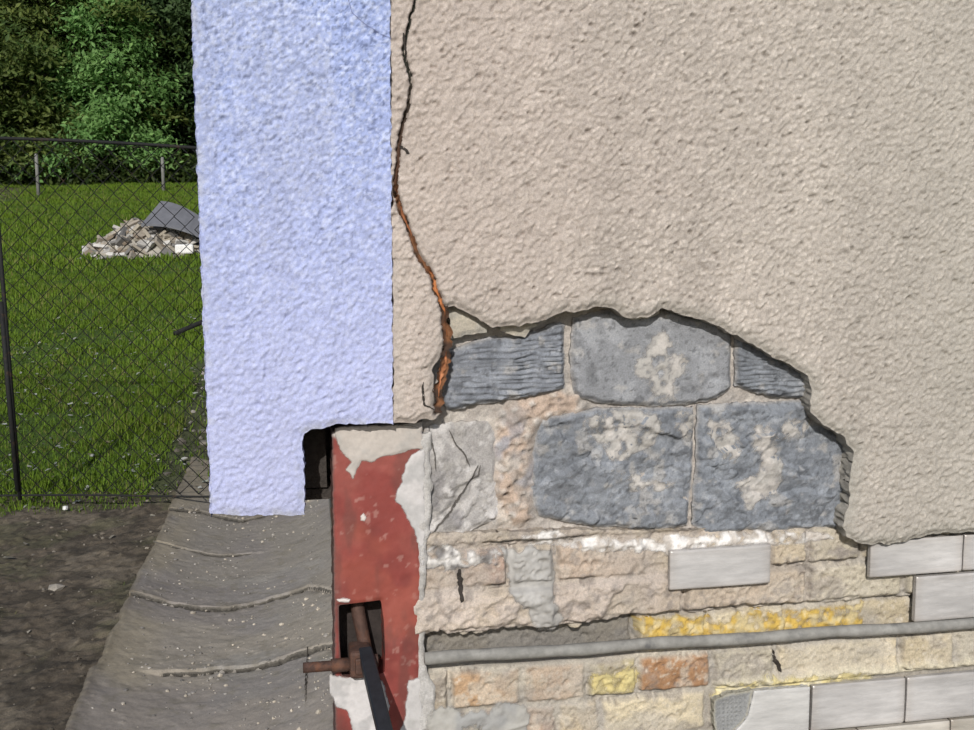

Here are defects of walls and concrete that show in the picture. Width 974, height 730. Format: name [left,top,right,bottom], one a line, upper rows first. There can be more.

crack [348,0,481,533]
rust [427,268,447,334]
rust [438,355,447,397]
crack [169,508,270,523]
spalling [329,306,974,730]
crack [153,540,251,557]
crack [130,587,332,612]
crack [163,644,332,694]